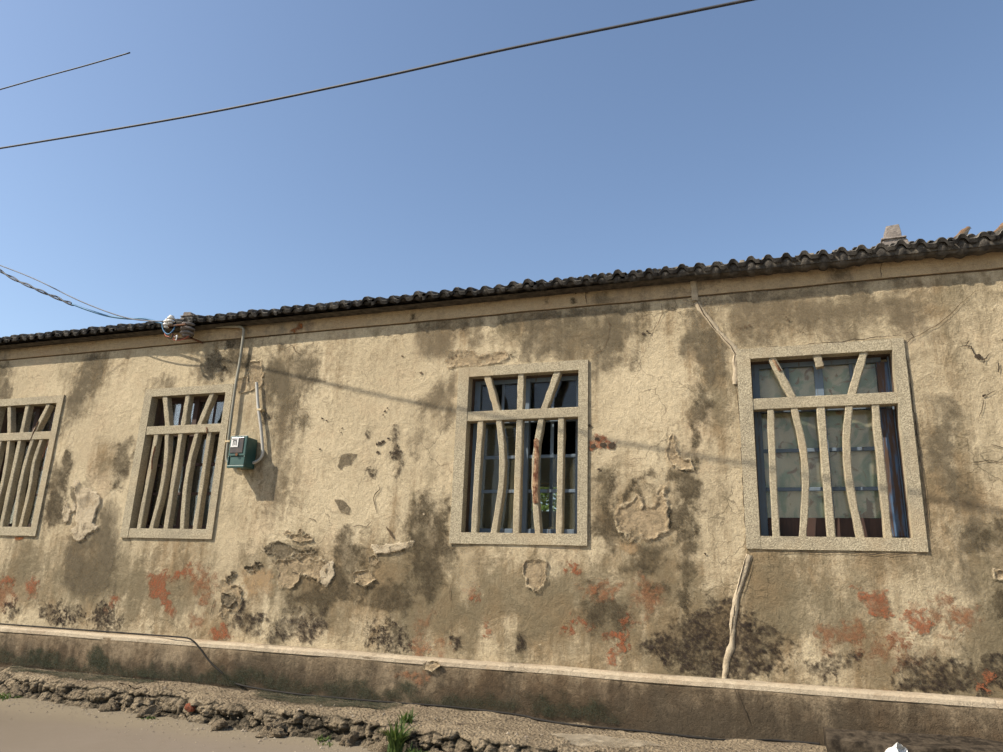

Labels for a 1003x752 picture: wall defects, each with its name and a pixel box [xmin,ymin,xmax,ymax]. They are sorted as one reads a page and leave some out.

damp [503,293,643,378]
crack [960,341,1000,417]
flaking render [62,480,101,542]
spalling [588,424,616,451]
damp [591,469,654,551]
damp [624,267,926,682]
crack [722,294,972,722]
damp [39,507,124,630]
spalling [147,528,336,641]
damp [232,490,476,654]
spalling [353,541,414,587]
flaking render [815,585,973,672]